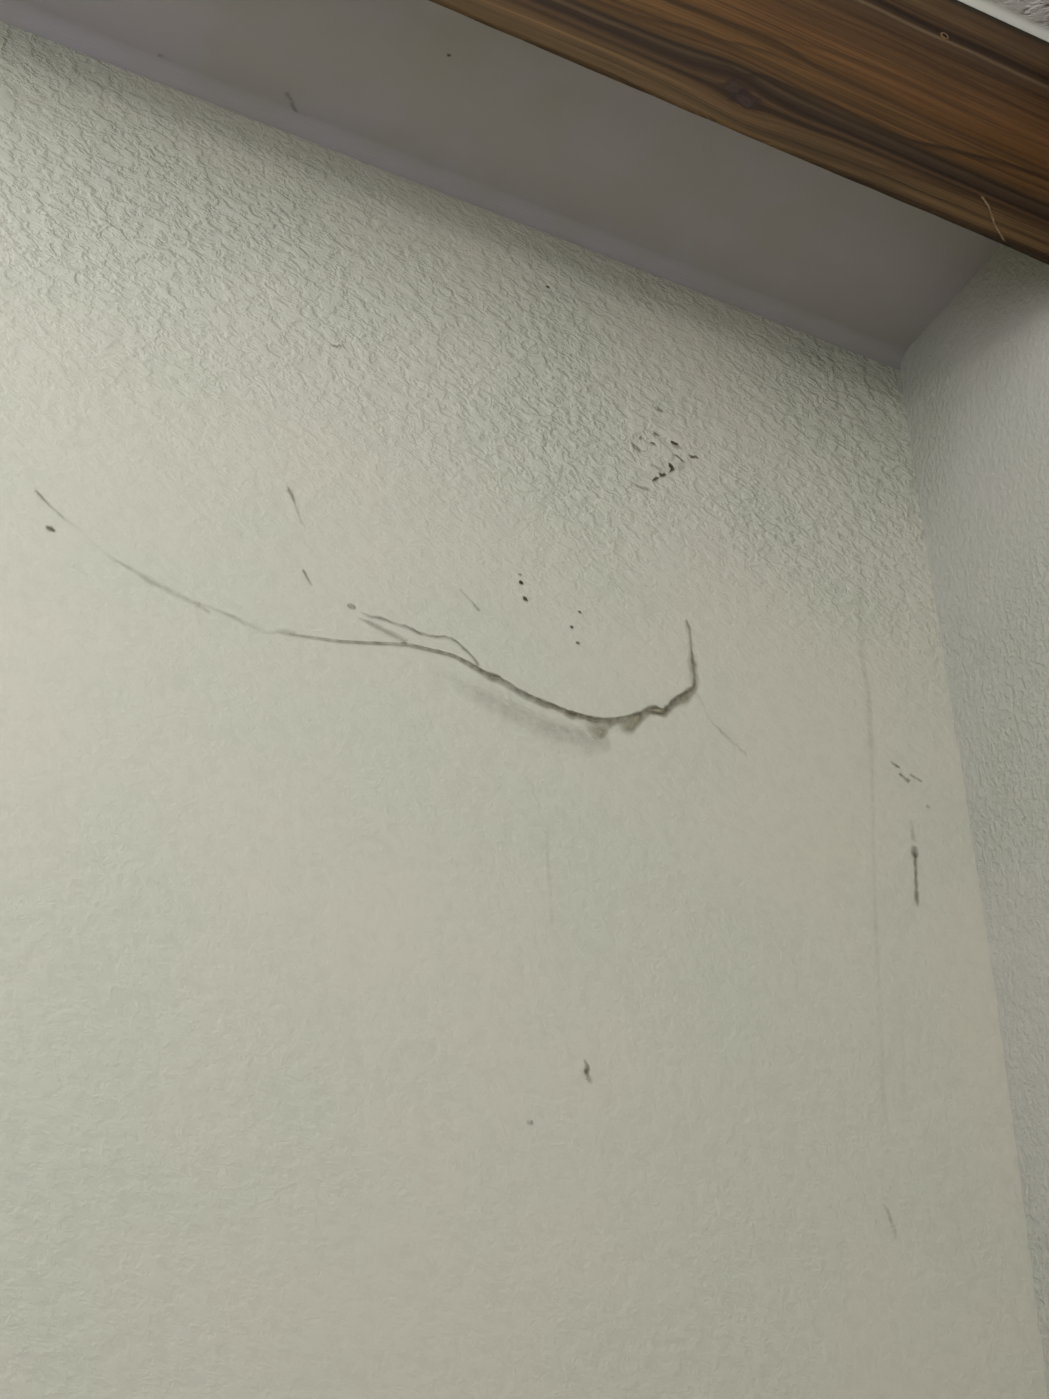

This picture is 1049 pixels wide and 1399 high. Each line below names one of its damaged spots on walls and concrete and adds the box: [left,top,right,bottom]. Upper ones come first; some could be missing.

crack [357,617,693,721]